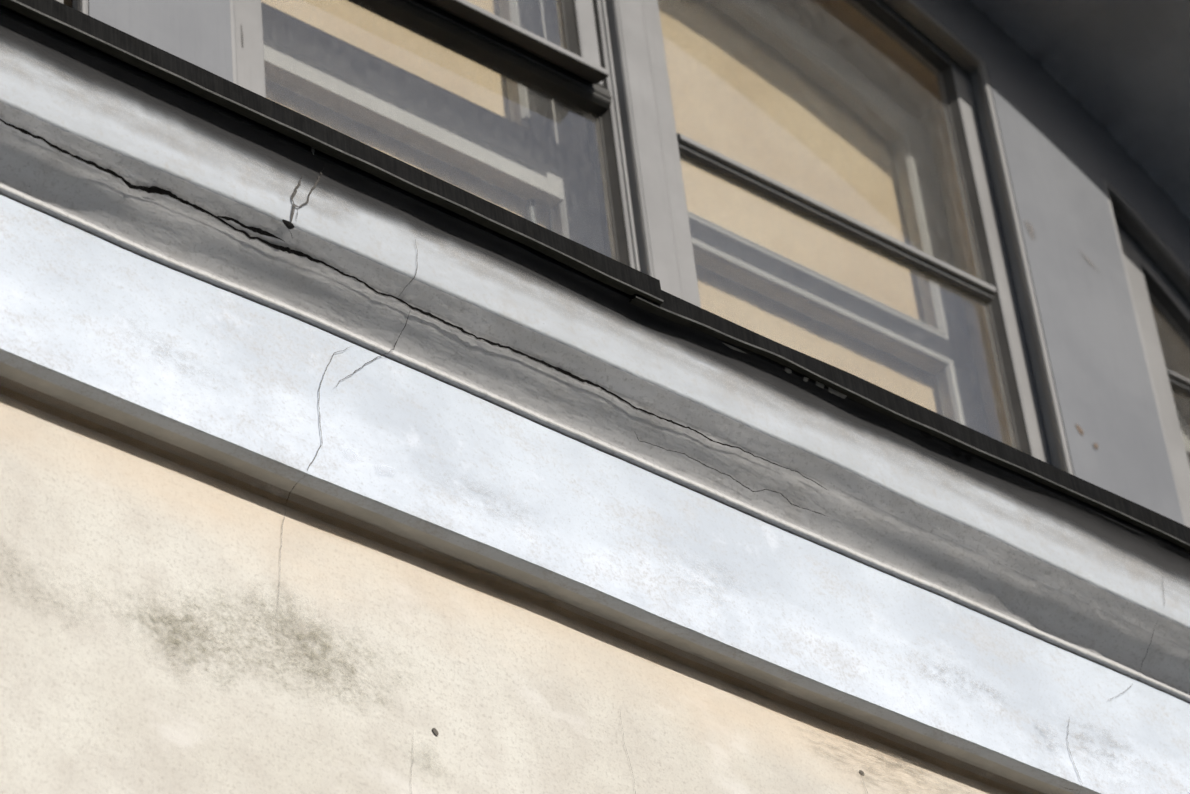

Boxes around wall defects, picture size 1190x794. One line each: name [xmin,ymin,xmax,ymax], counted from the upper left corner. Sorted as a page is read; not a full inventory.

crack [0,119,827,626]